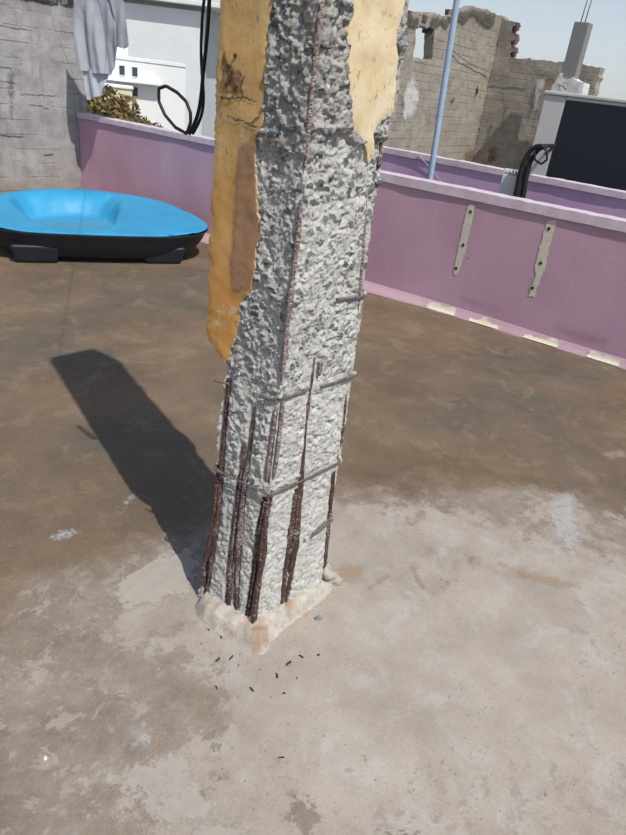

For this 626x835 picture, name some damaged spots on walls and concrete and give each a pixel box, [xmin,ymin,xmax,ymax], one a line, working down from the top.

spalling [510,22,521,58]
crack [0,66,56,109]
crack [219,76,283,138]
damp [403,79,418,119]
crack [322,127,354,136]
peeling [454,204,475,275]
peeling [529,220,557,297]
spalling [109,0,433,621]
peeling [425,301,457,316]
peeling [469,317,500,329]
peeling [523,333,559,347]
peeling [586,351,621,367]